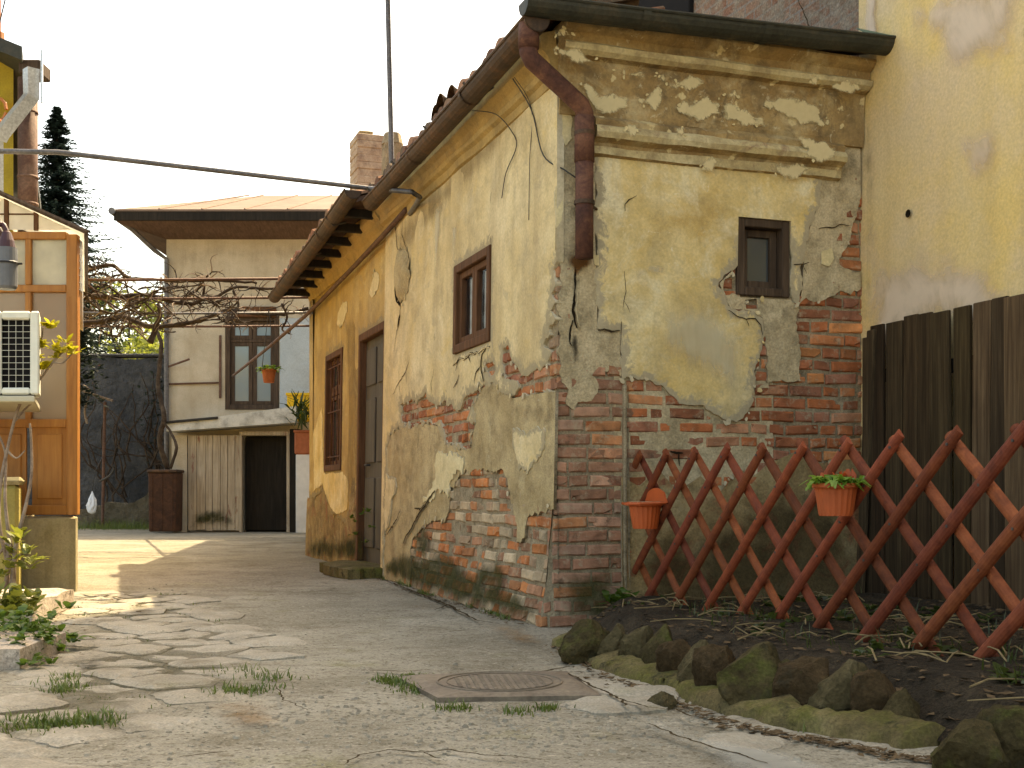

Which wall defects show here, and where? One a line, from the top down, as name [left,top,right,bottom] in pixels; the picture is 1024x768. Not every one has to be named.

peeling [384,69,862,628]